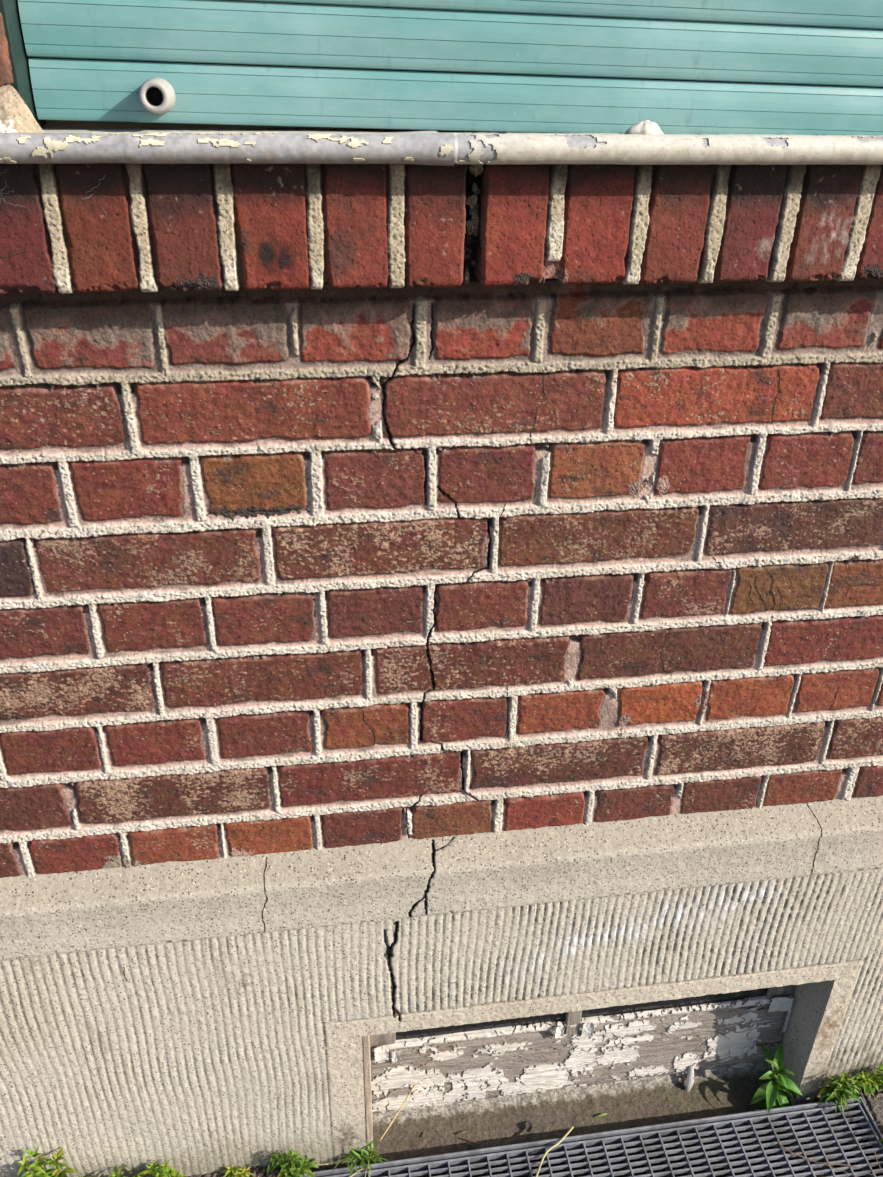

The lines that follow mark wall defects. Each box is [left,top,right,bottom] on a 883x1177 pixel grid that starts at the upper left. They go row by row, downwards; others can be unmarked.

peeling [17,128,883,165]
crack [383,303,506,1021]
crack [807,803,822,875]
crack [235,850,268,933]
peeling [371,995,794,1113]